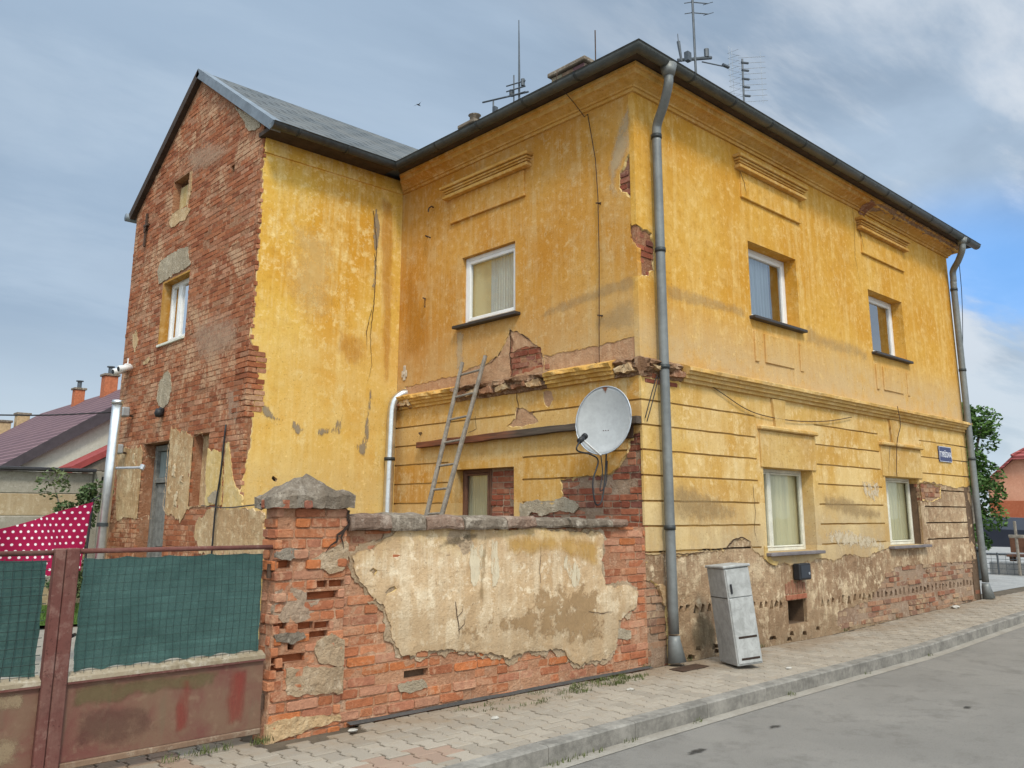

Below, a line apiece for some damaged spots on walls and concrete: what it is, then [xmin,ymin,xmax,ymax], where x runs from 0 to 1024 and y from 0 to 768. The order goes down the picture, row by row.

spalling [619,154,631,198]
spalling [631,225,655,276]
crack [366,211,378,380]
spalling [457,329,678,408]
spalling [531,430,648,548]
crack [326,510,350,552]
spalling [307,580,341,599]
spalling [645,481,981,668]
spalling [298,621,326,637]